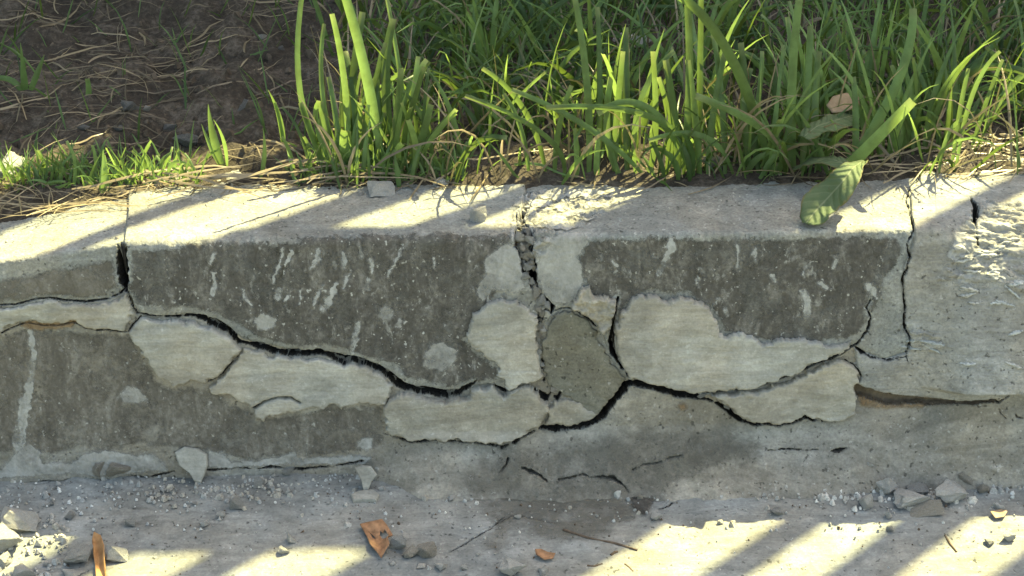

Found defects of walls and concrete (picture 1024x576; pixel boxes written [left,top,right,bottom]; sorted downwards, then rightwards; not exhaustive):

leakage [0,329,382,460]
crack [0,289,477,398]
peeling [0,187,859,445]
crack [400,193,846,484]
crack [767,189,914,383]
crack [970,200,979,246]